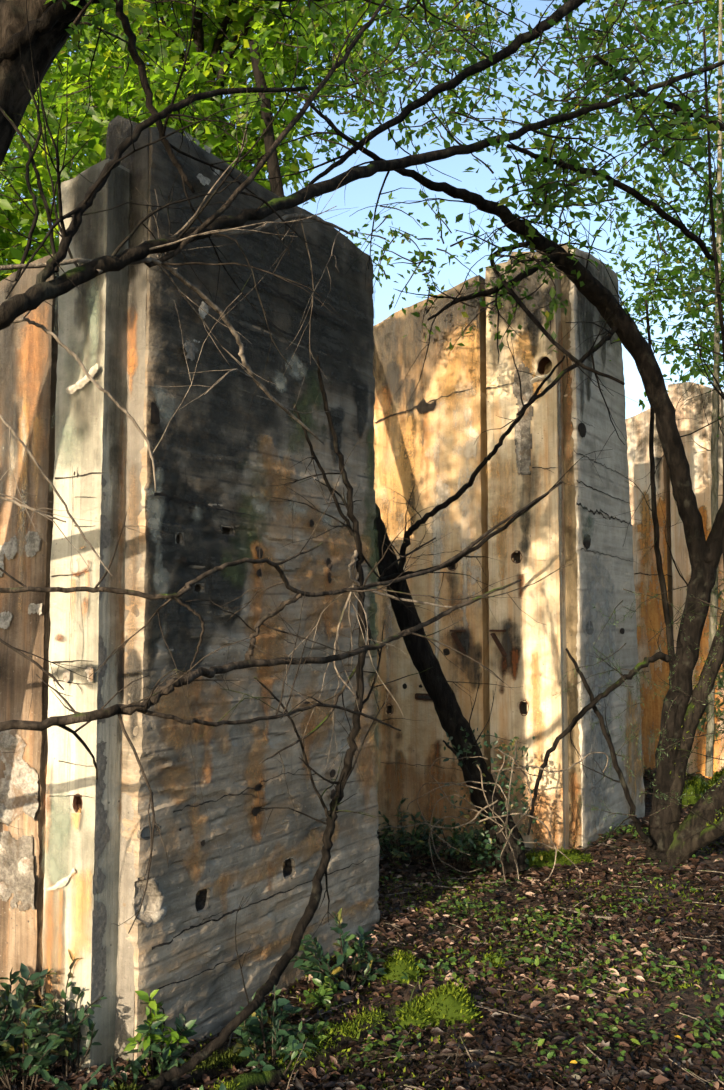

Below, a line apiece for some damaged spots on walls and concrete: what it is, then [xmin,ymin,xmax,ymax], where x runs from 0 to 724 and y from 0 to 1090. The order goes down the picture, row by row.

damp [70,126,136,266]
rust [21,329,38,389]
damp [75,264,140,473]
rust [442,328,480,404]
rust [19,405,38,535]
damp [117,144,555,739]
rust [383,416,427,542]
rust [296,515,370,637]
rust [156,685,211,779]
rust [248,542,284,841]
spalling [0,729,38,912]
crack [152,853,383,950]